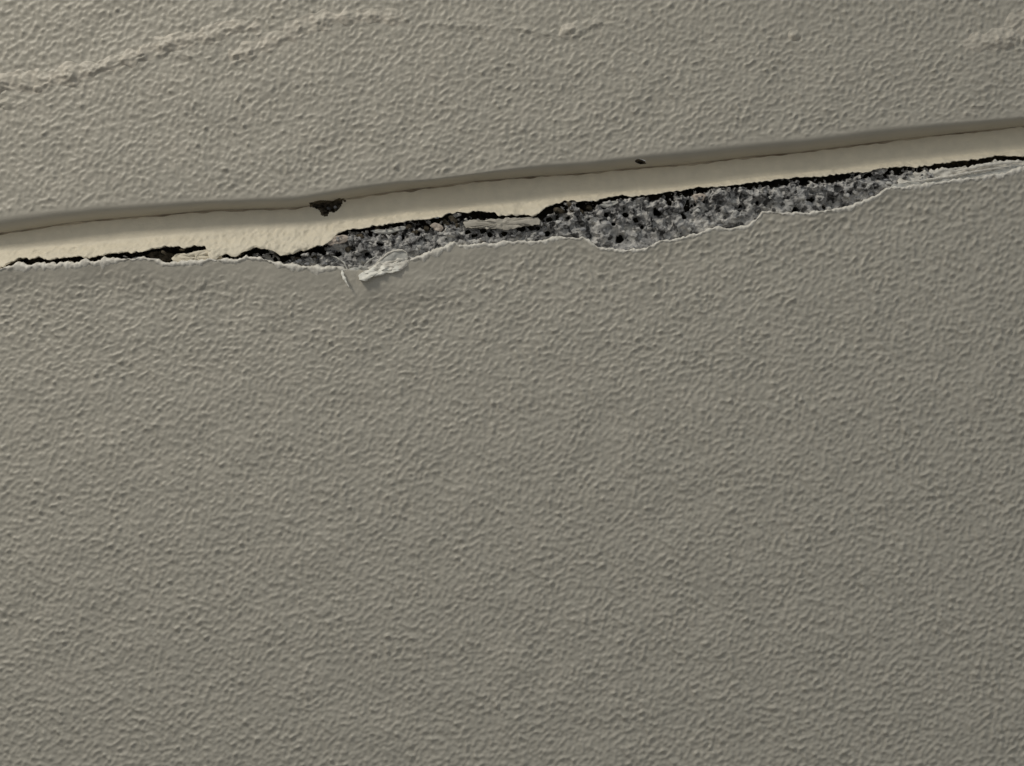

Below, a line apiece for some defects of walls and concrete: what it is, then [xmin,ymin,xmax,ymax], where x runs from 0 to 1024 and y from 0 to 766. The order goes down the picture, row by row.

spalling [217,168,934,287]